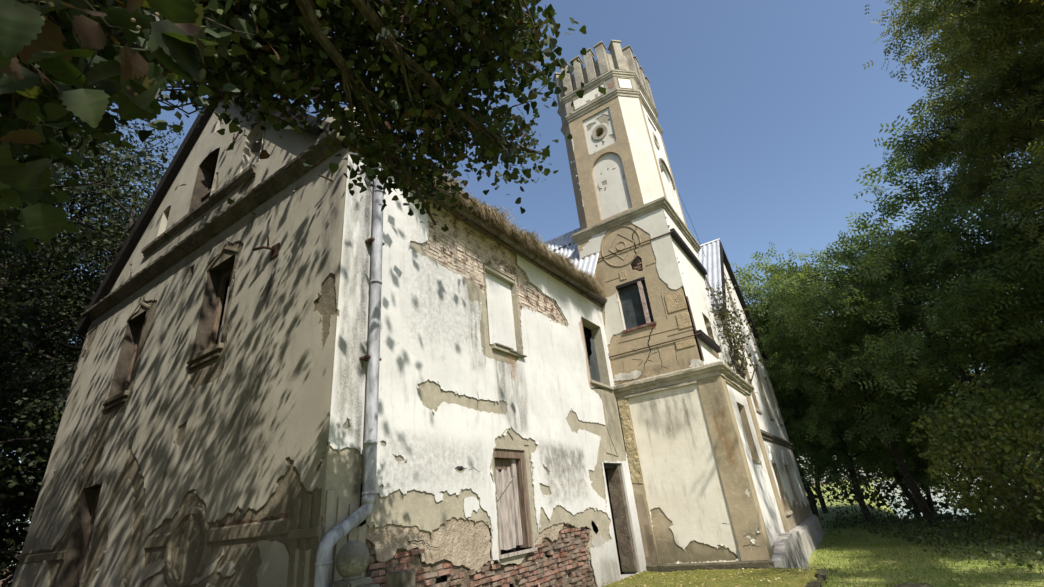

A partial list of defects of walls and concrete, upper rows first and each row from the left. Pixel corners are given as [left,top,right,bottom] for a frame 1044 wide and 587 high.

crack [631,226,643,271]
crack [623,324,678,373]
peeling [78,199,702,587]
peeling [20,297,157,587]
peeling [633,492,770,565]